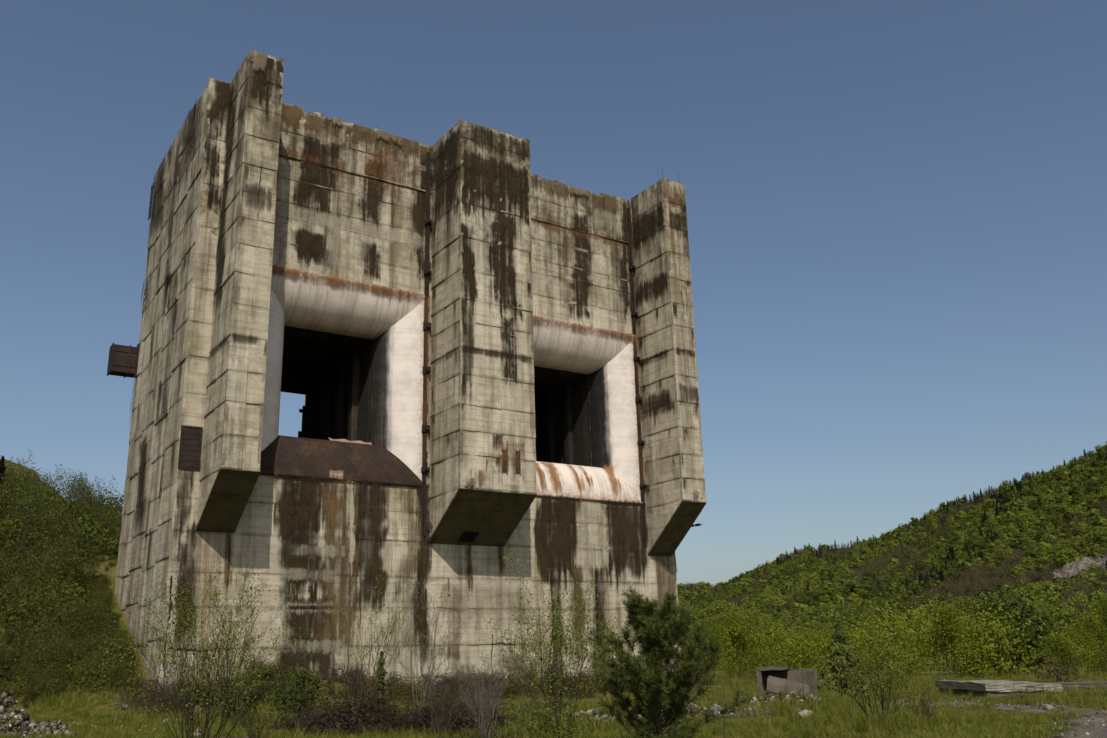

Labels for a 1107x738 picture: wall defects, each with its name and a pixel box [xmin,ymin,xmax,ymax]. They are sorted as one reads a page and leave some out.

damp [245,57,695,407]
rust [272,265,418,299]
damp [132,79,243,641]
damp [210,333,267,356]
damp [640,380,699,424]
rust [536,462,593,489]
rust [604,466,622,494]
damp [166,473,459,692]
damp [534,485,678,676]